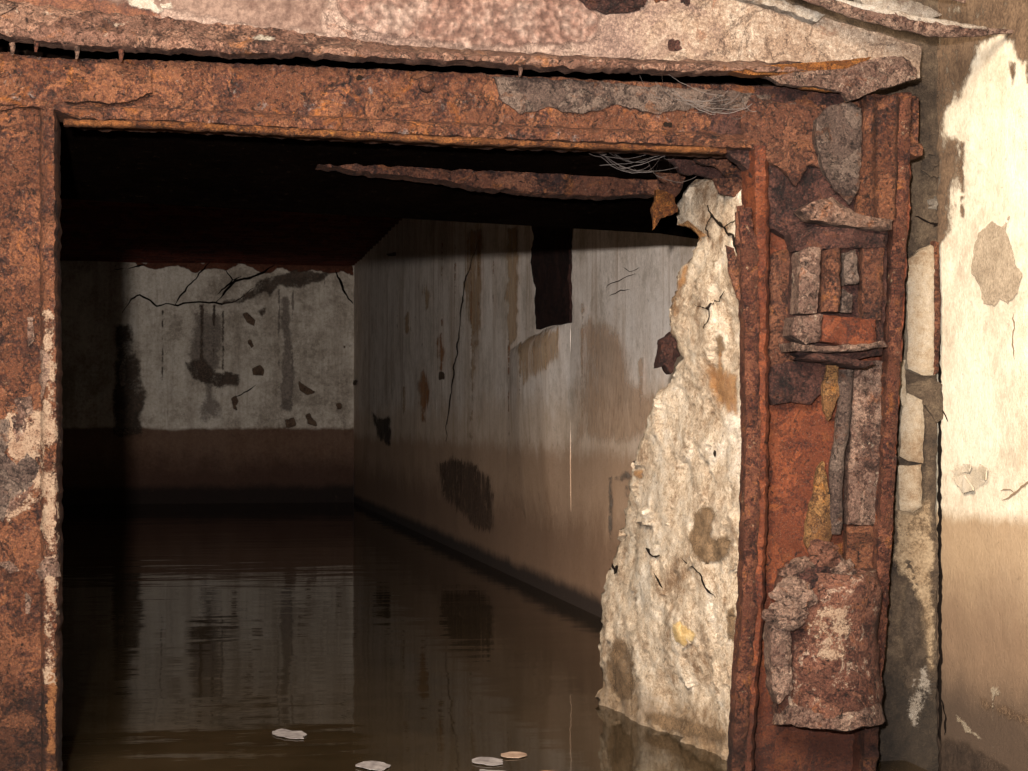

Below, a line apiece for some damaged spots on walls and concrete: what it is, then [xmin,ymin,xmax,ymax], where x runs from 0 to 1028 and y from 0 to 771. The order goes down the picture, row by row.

rust [315,156,742,240]
crack [122,263,275,313]
crack [335,270,353,304]
rust [454,230,494,346]
rust [504,227,558,380]
spalling [971,216,1022,306]
crack [445,241,479,440]
rust [716,335,724,370]
rust [418,370,429,421]
peeling [952,464,988,494]
spalling [683,507,735,572]
spalling [726,606,736,641]